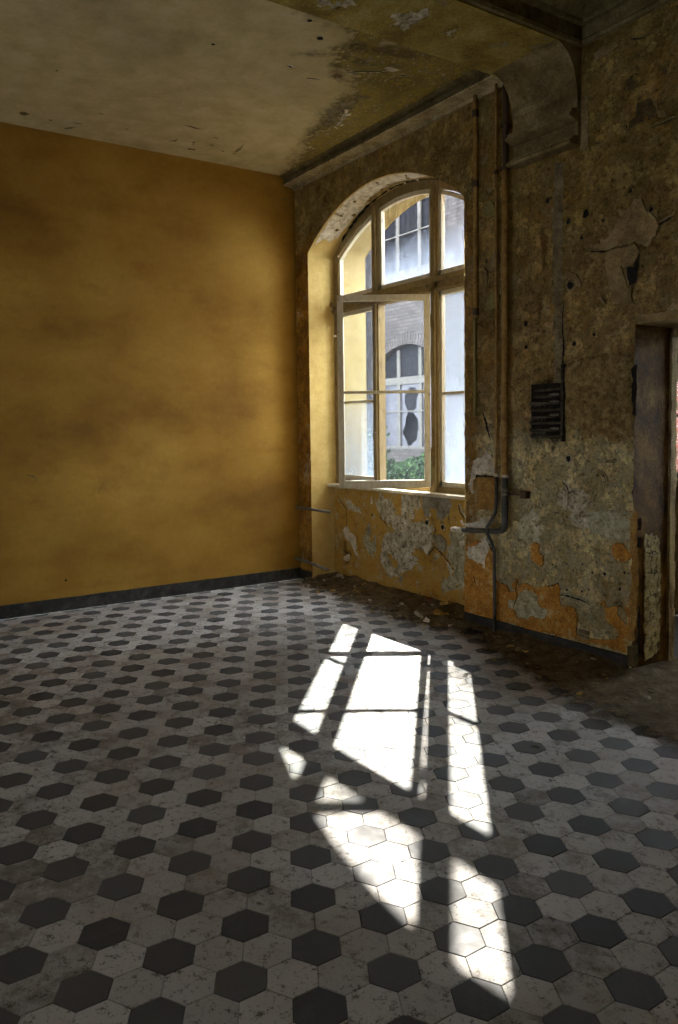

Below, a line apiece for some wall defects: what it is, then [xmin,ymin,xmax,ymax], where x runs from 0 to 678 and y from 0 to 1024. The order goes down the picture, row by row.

peeling [389,8,430,31]
leakage [285,27,474,171]
peeling [315,173,432,244]
peeling [565,187,660,304]
flaking render [468,450,500,494]
peeling [336,486,661,661]